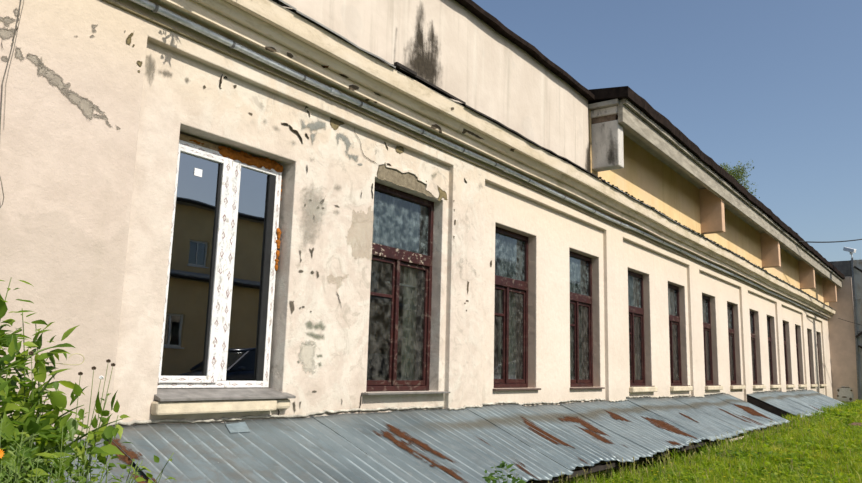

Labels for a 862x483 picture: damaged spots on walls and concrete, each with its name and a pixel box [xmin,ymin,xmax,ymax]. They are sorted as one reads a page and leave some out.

flaking render [0,8,18,39]
water stain [408,11,439,85]
flaking render [1,47,121,129]
flaking render [377,162,448,201]
corrosion [373,422,468,483]
corrosion [520,416,587,463]
corrosion [558,416,613,444]
corrosion [606,411,697,446]